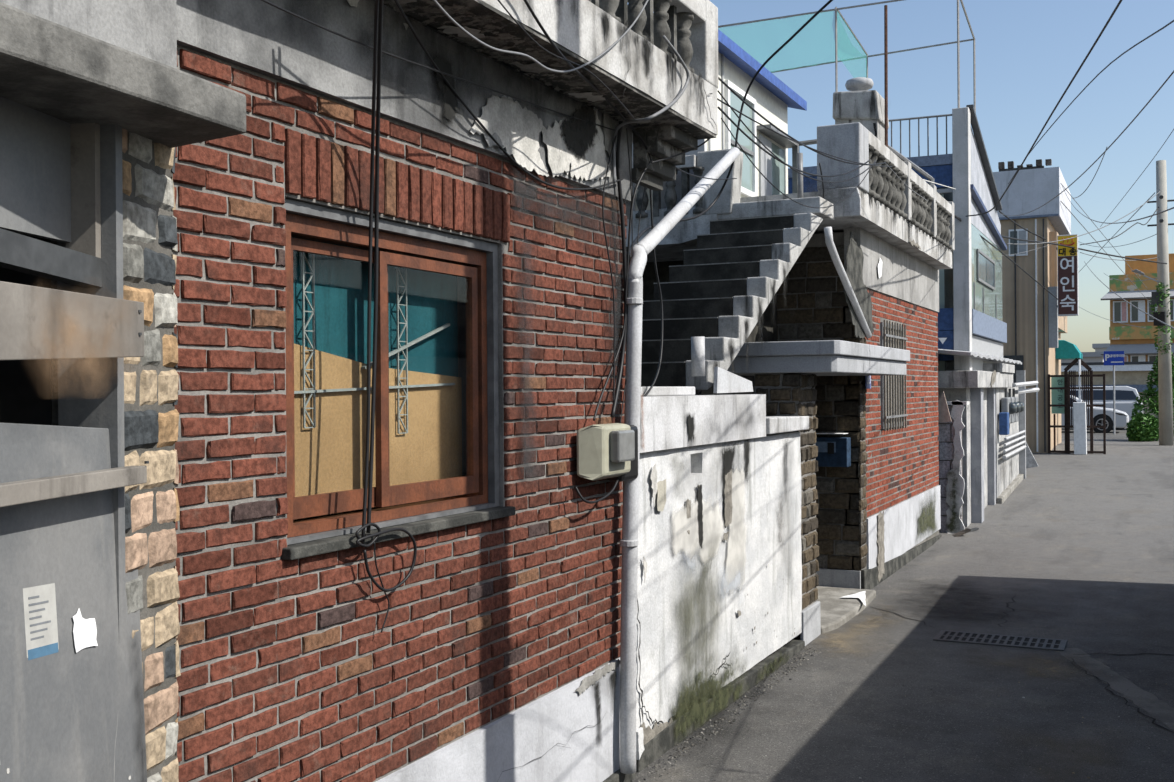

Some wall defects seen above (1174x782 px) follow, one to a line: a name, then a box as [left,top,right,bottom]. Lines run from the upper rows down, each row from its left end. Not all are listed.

flaking render [383,0,695,181]
peeling [650,464,666,511]
flaking render [686,484,703,547]
flaking render [724,469,733,540]